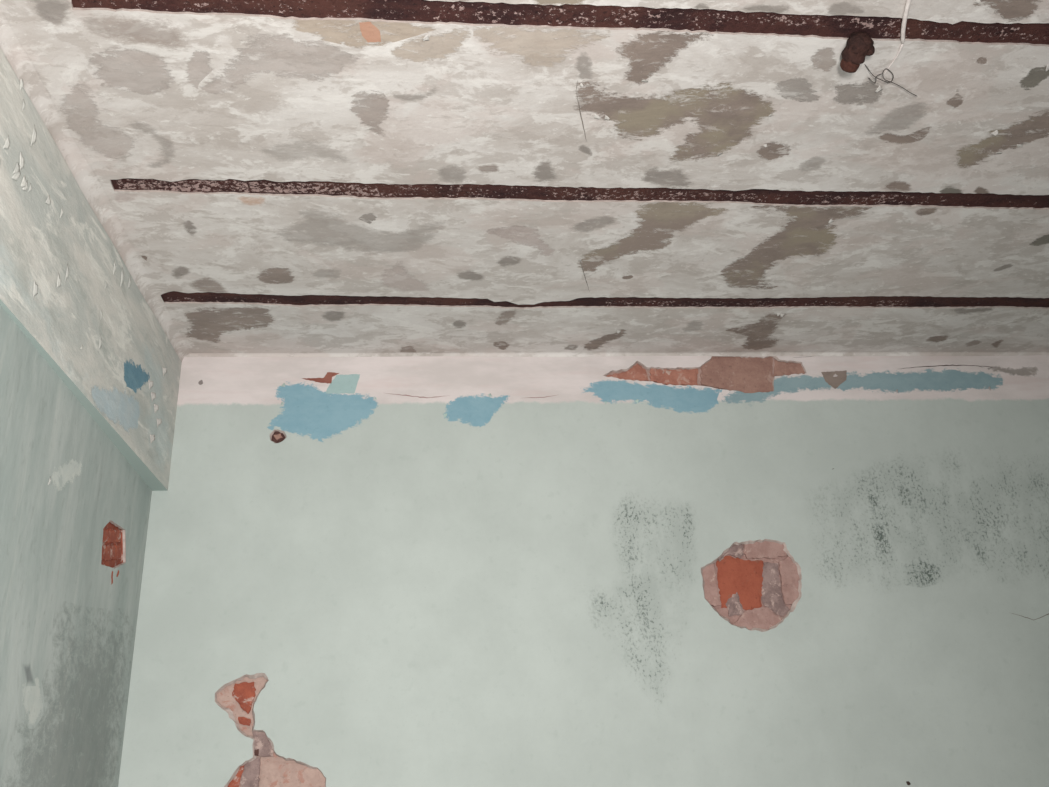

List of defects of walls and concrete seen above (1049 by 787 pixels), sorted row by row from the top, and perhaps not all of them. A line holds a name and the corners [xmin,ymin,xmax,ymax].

rust [234,194,272,207]
peeling [263,372,381,445]
peeling [439,391,512,432]
peeling [576,311,1042,417]
spalling [101,520,126,584]
damp [578,486,706,727]
spalling [701,539,802,632]
damp [798,439,1049,603]
spalling [215,673,326,787]